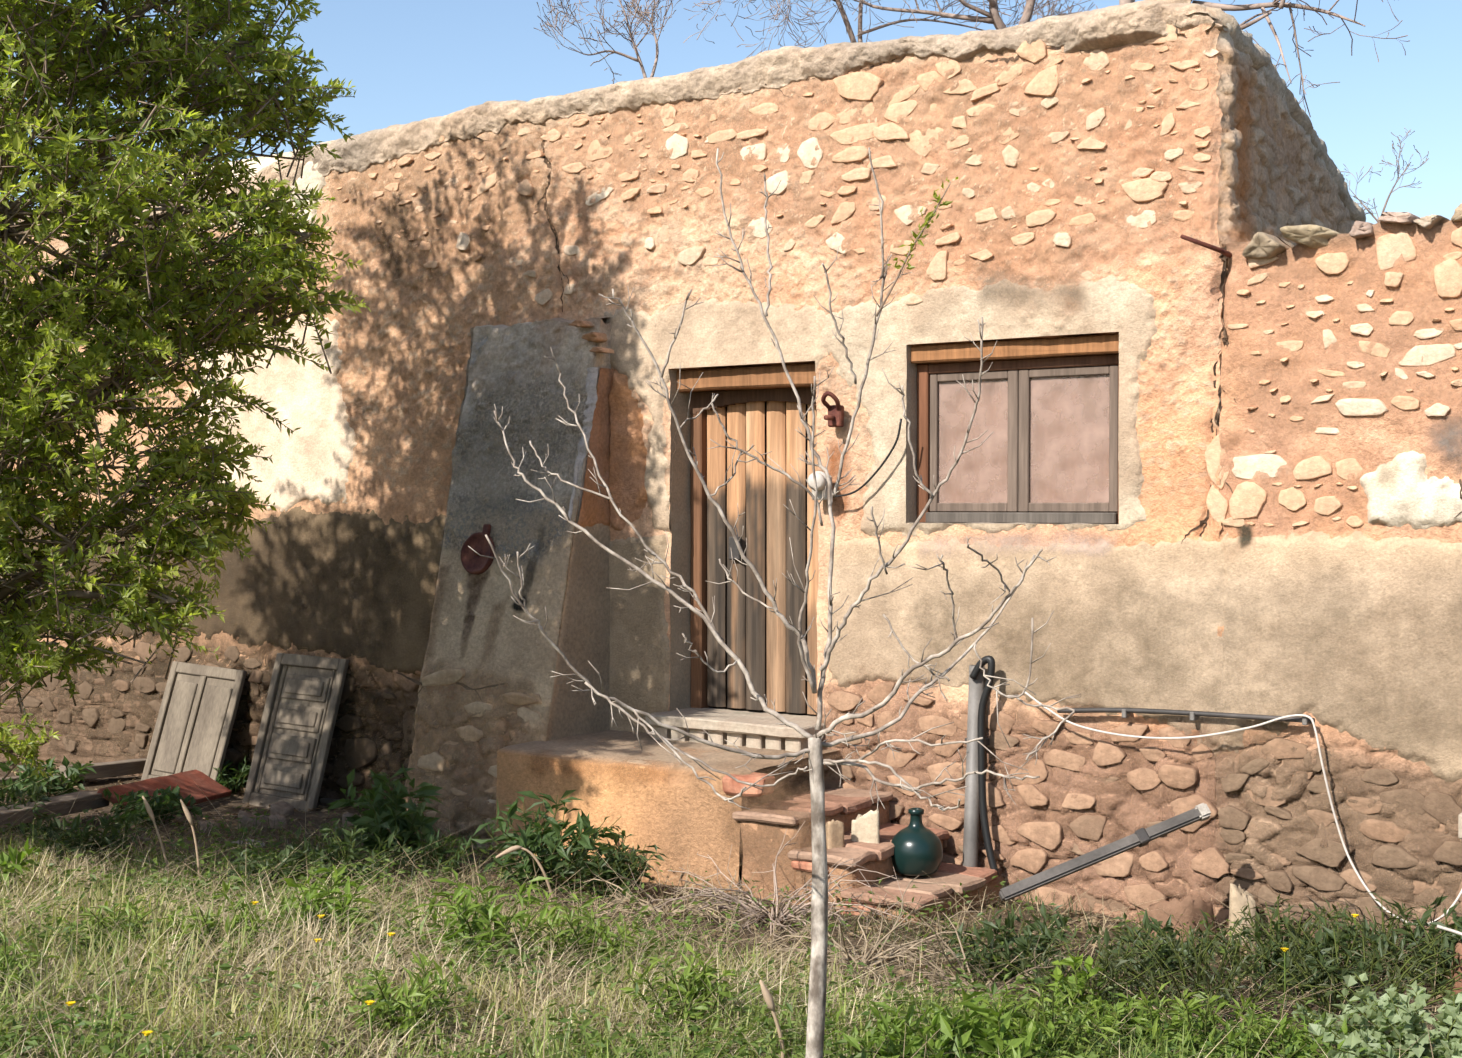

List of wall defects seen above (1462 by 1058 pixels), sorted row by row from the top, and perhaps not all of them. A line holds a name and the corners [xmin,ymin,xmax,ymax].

crack [534,140,570,312]
flaking render [568,320,648,531]
crack [1181,482,1233,544]
crack [1210,246,1237,439]
flaking render [0,632,277,771]
flaking render [827,682,1462,937]